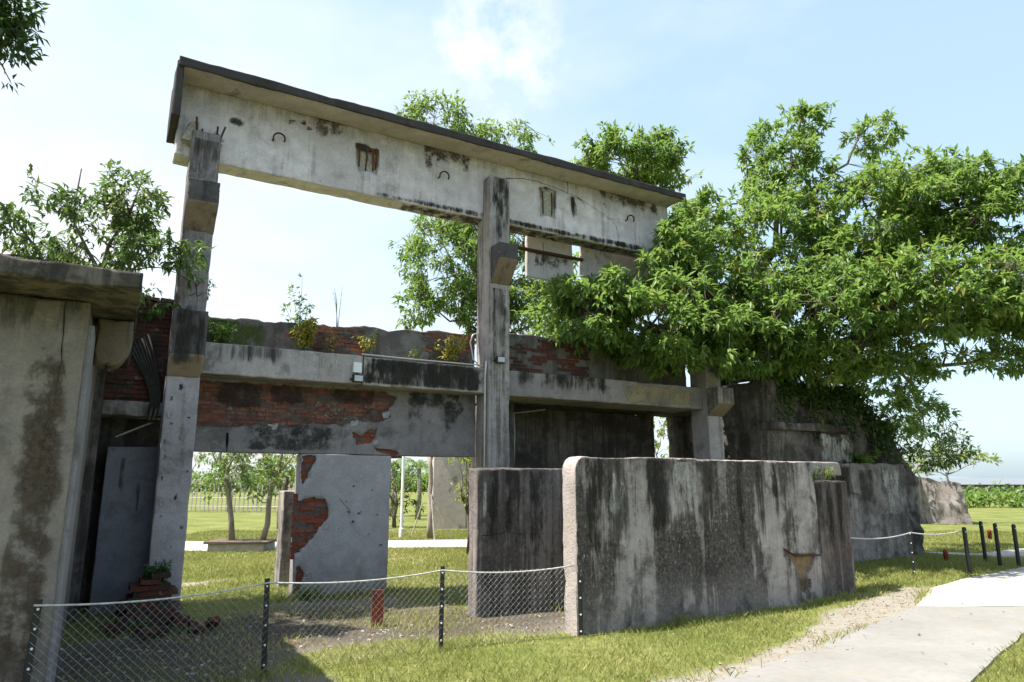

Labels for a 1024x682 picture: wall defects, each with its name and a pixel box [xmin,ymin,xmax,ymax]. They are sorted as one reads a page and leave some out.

leakage [383,193,477,216]
crack [506,178,619,241]
leakage [493,178,657,252]
spalling [187,379,402,459]
leakage [249,358,481,451]
leakage [0,356,65,682]
spalling [289,455,328,593]
leakage [483,470,544,541]
leakage [587,459,629,554]
leakage [647,460,679,532]
leakage [694,461,714,528]
leakage [757,462,779,534]